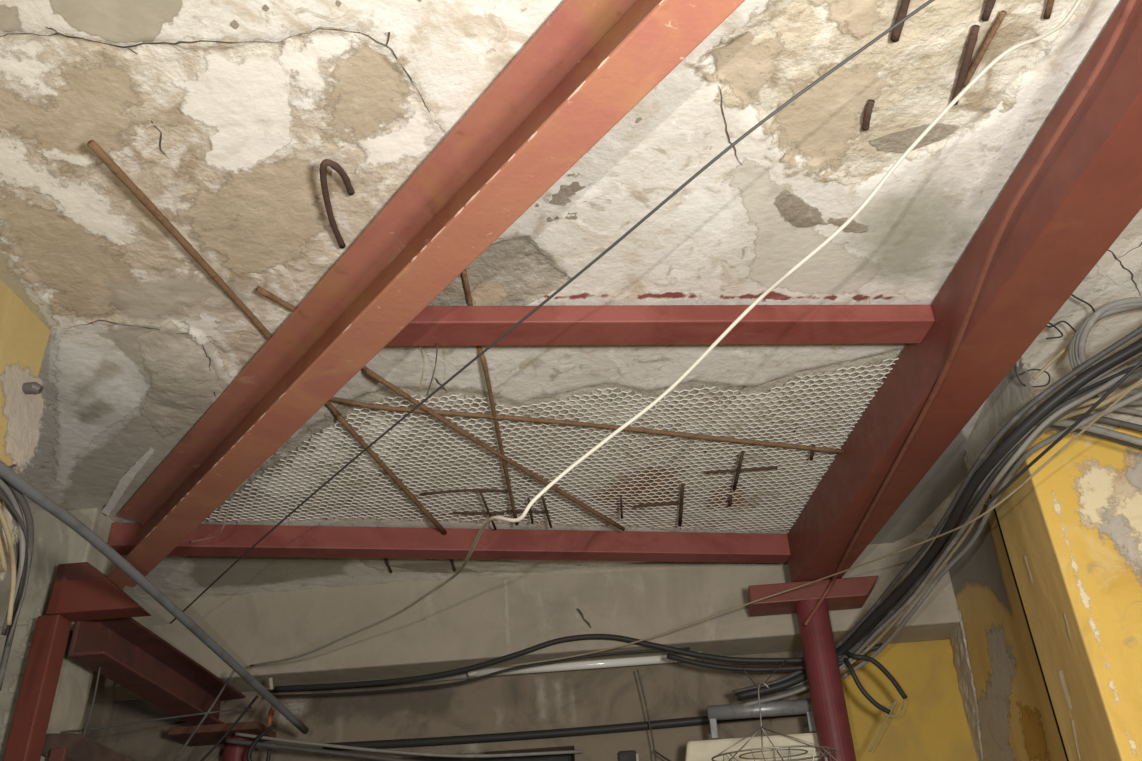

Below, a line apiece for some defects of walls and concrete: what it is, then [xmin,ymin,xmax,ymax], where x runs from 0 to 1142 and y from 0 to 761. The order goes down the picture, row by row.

crack [151,120,169,159]
crack [0,27,444,132]
spalling [0,5,447,486]
spalling [411,154,515,262]
spalling [693,0,1079,295]
peeling [1097,237,1142,285]
spalling [1046,399,1142,435]
spalling [1074,448,1142,585]
peeling [1052,491,1120,704]
peeling [951,608,1049,761]